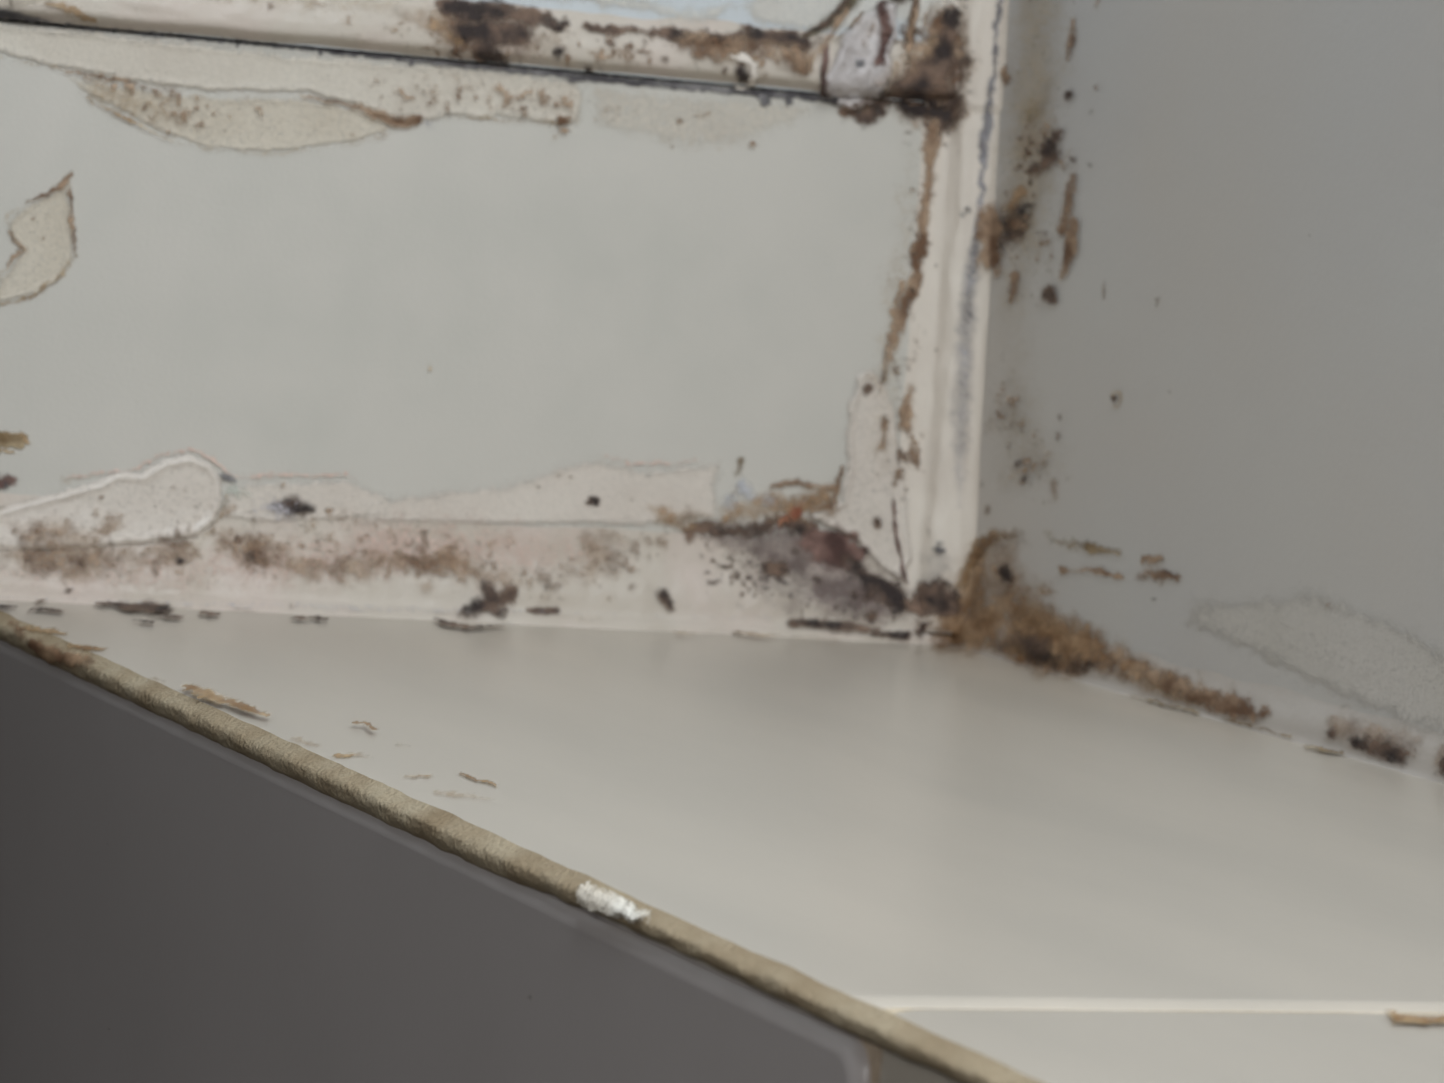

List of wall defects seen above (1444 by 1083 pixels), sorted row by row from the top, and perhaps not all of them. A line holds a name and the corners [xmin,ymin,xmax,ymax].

leakage [424,0,857,72]
leakage [59,68,583,155]
peeling [0,179,75,302]
leakage [838,0,972,489]
leakage [961,0,1078,500]
leakage [0,431,29,453]
leakage [0,447,640,667]
leakage [643,589,675,618]
leakage [683,514,961,639]
leakage [1058,541,1181,582]
leakage [1139,669,1291,738]
leakage [1306,717,1410,764]